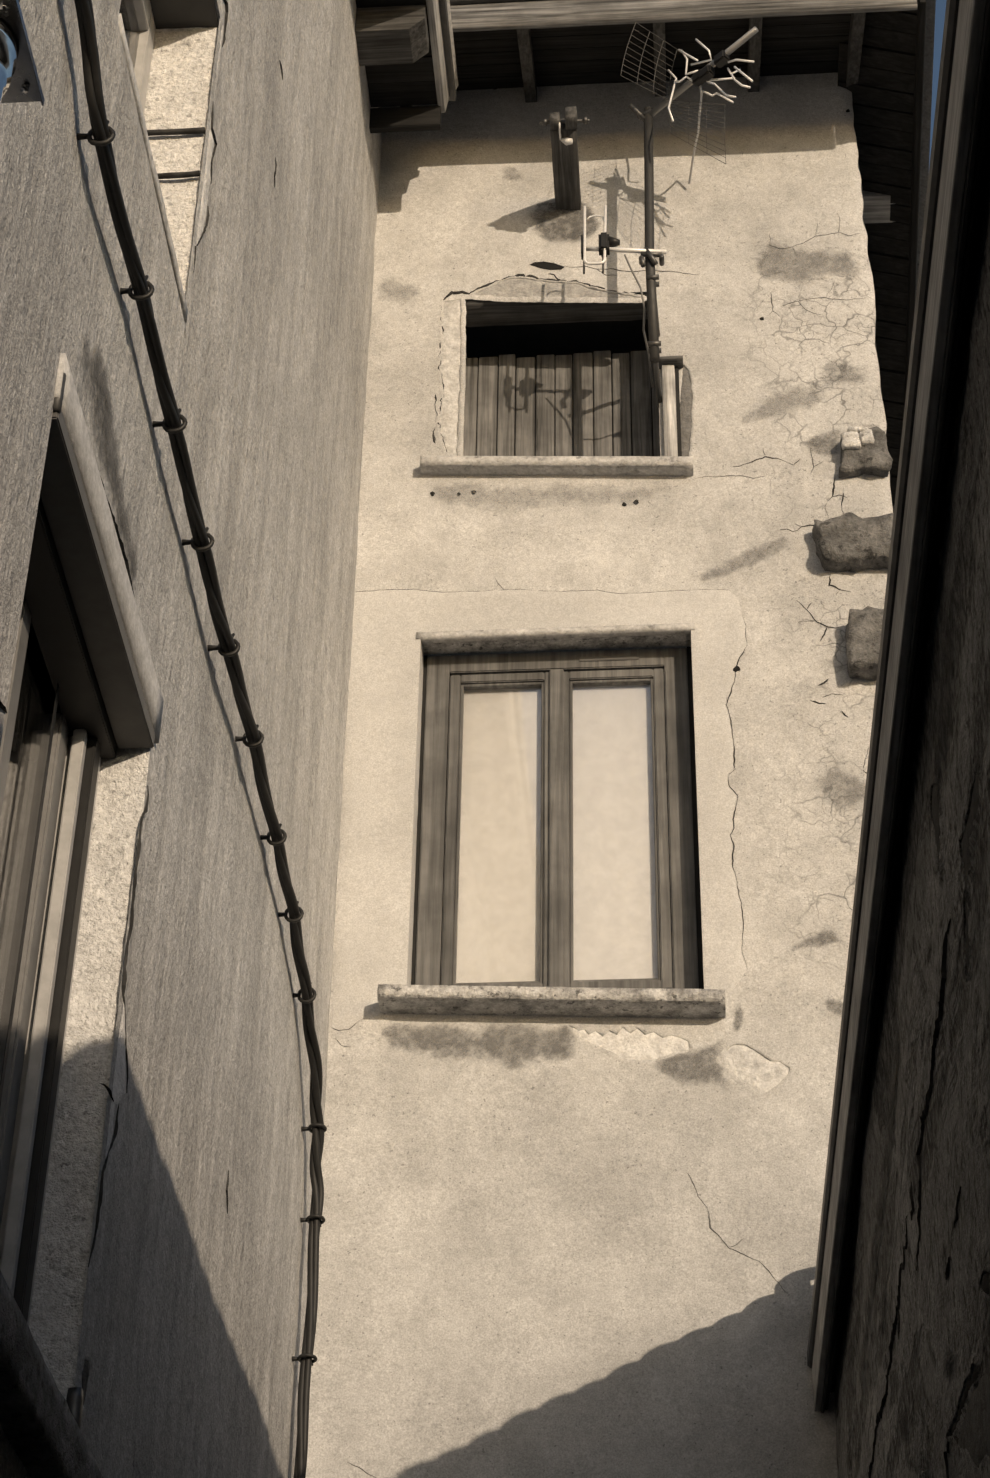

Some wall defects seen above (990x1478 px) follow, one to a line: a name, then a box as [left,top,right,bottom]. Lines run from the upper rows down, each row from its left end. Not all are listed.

leakage [536,203,596,240]
crack [769,213,860,252]
crack [769,280,863,315]
crack [796,573,849,641]
crack [810,678,848,717]
crack [358,578,747,962]
leakage [385,1025,569,1064]
spalling [720,1041,795,1099]
crack [868,919,961,1478]
crack [688,1174,787,1293]